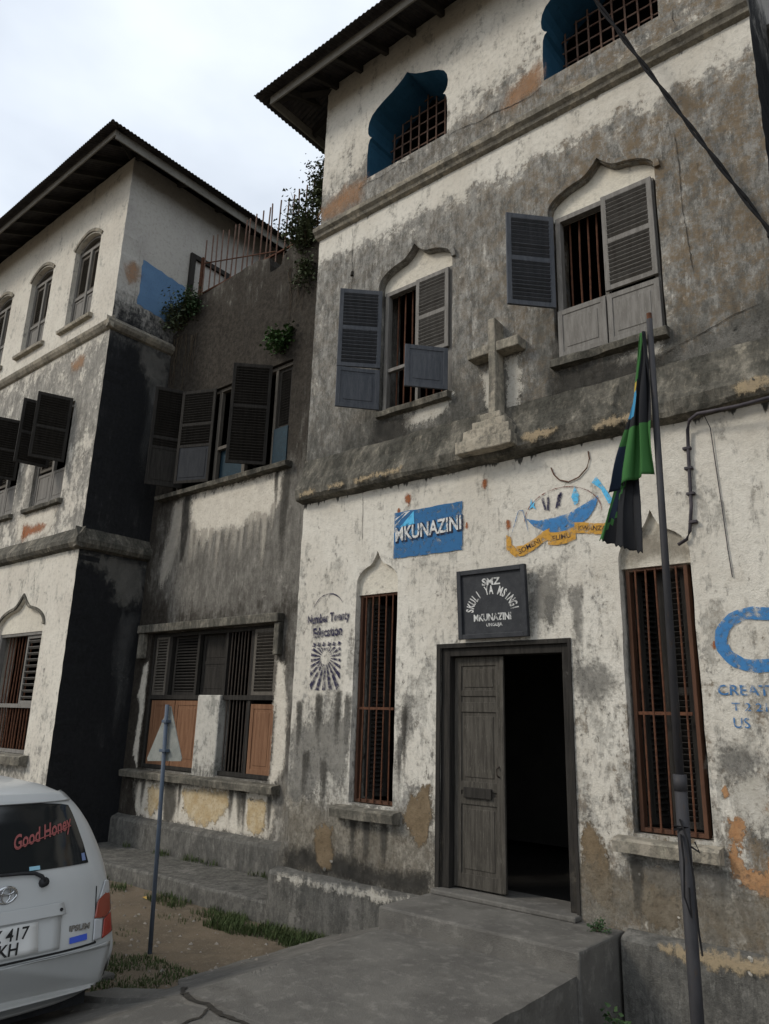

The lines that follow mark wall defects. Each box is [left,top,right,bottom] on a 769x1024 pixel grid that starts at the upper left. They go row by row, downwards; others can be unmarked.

crack [674,134,694,272]
water stain [160,496,190,585]
water stain [275,471,289,553]
flaking render [132,661,288,839]
water stain [286,691,352,803]
water stain [396,694,414,774]
spalling [277,822,410,904]
water stain [284,820,431,895]
spalling [402,784,433,848]
flaking render [721,773,769,898]
spalling [700,949,769,978]
crack [180,987,250,1024]